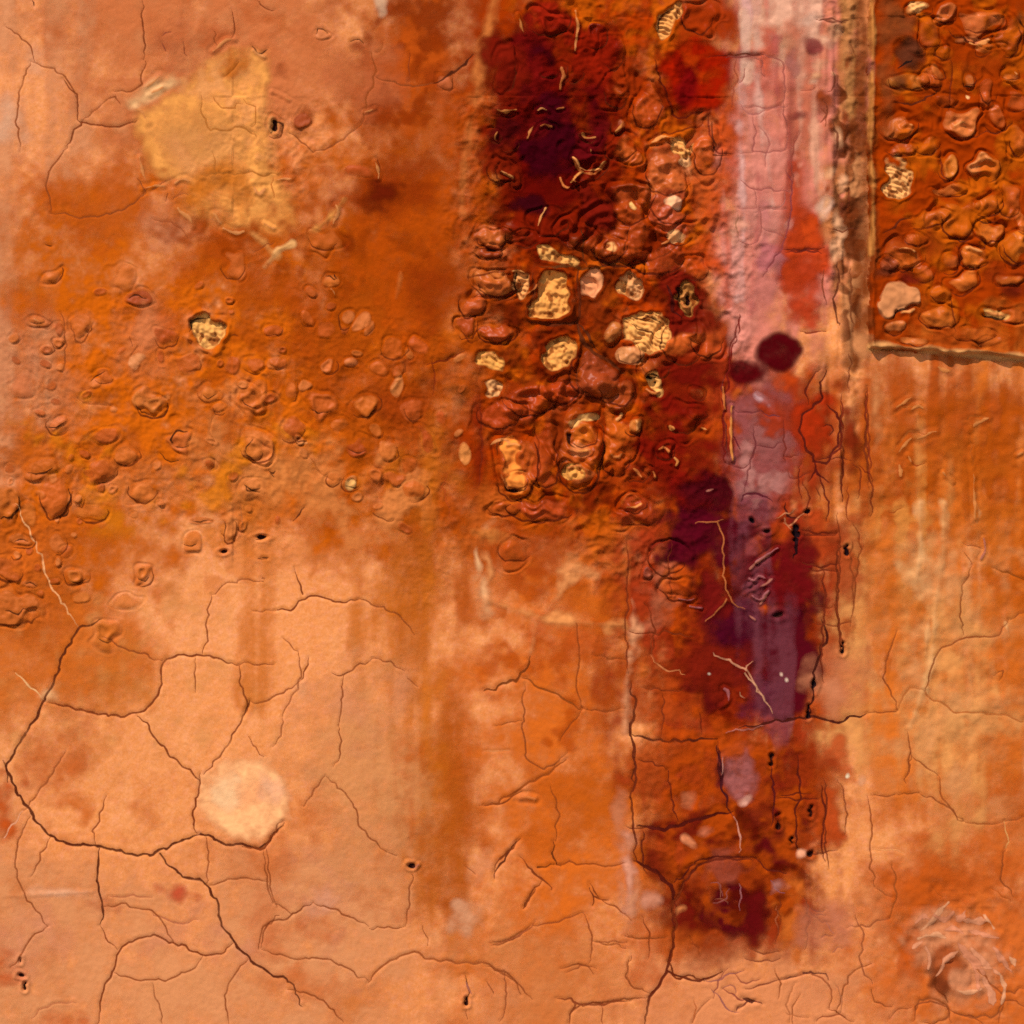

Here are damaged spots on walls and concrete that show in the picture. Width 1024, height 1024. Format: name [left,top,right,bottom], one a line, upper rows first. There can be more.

water stain [0,310,16,450]
crack [9,13,185,229]
water stain [45,0,356,144]
spalling [512,245,578,319]
spalling [541,337,577,371]
rust [463,0,740,273]
spalling [616,271,671,354]
crack [655,53,858,334]
rust [0,129,845,1024]
crack [1,317,1023,1024]
rust [680,273,1024,811]
water stain [0,662,472,1024]